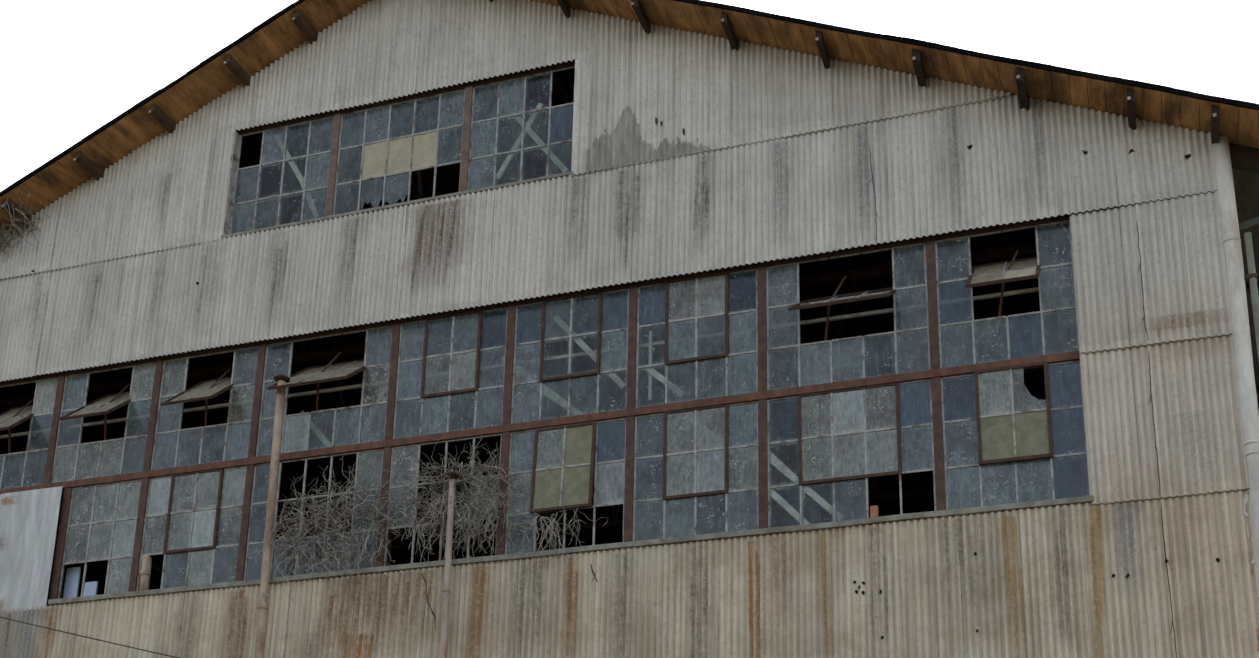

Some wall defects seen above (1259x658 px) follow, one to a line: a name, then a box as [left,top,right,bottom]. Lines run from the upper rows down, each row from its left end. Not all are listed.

corrosion [748,542,759,658]